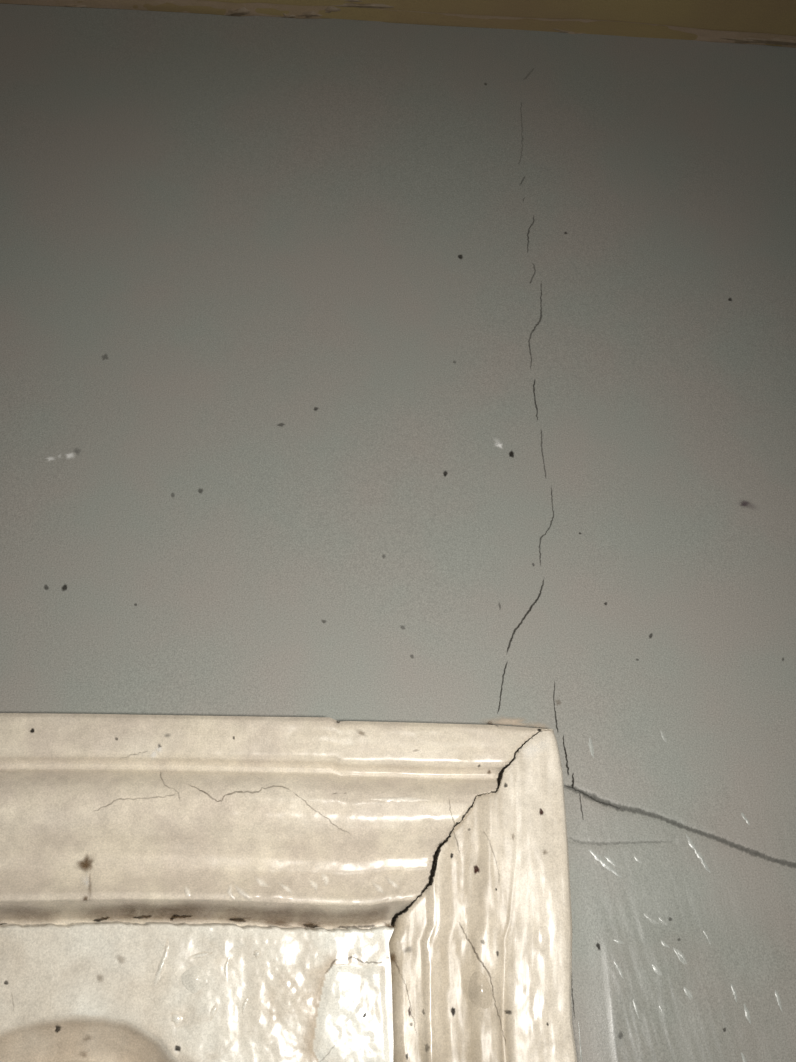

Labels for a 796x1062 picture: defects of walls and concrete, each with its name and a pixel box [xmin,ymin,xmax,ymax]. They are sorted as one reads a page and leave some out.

crack [498,580,544,712]
crack [345,685,796,928]